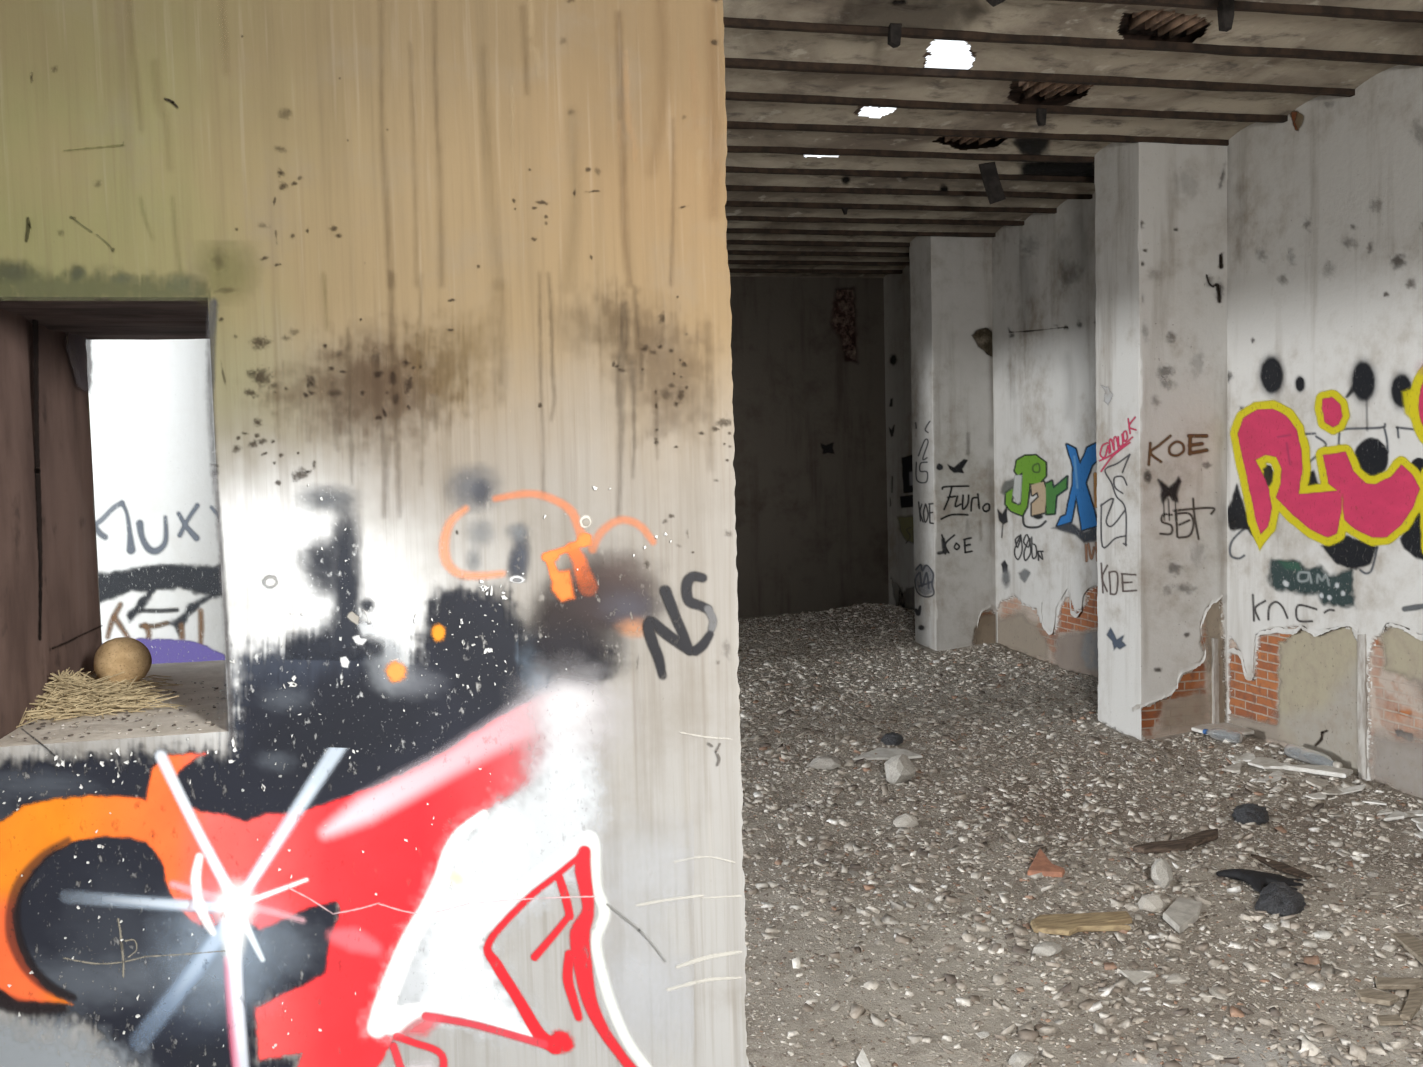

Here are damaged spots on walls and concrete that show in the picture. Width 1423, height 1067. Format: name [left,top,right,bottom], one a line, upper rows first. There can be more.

spalling [1116,9,1212,38]
spalling [1009,81,1094,100]
leakage [247,371,267,394]
leakage [304,345,454,419]
leakage [0,263,233,741]
spalling [973,582,1098,678]
spalling [1132,592,1423,798]